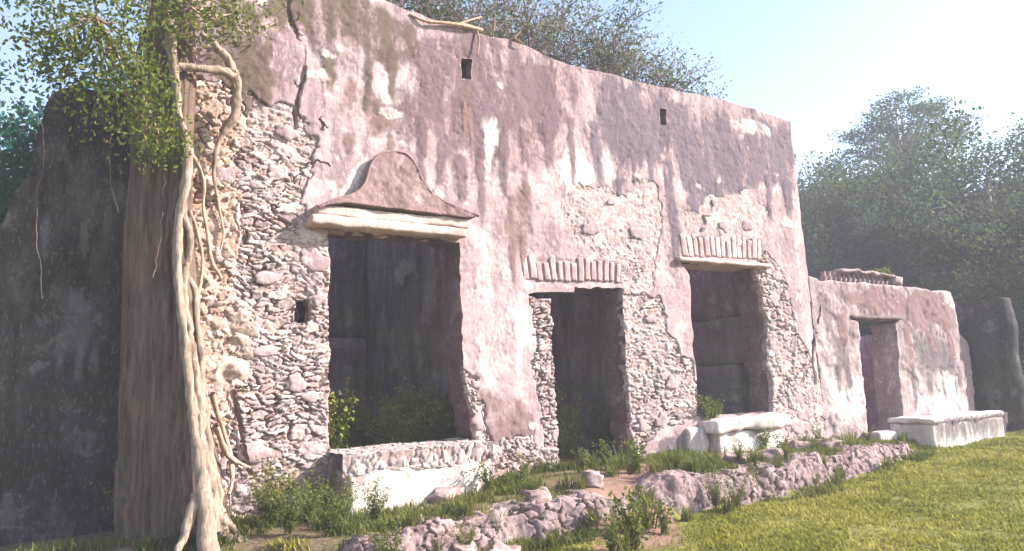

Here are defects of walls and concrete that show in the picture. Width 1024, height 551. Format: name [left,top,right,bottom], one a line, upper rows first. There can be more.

crack [287,0,328,131]
leakage [205,0,576,281]
spalling [193,76,344,521]
spalling [543,147,698,454]
spalling [750,252,865,441]